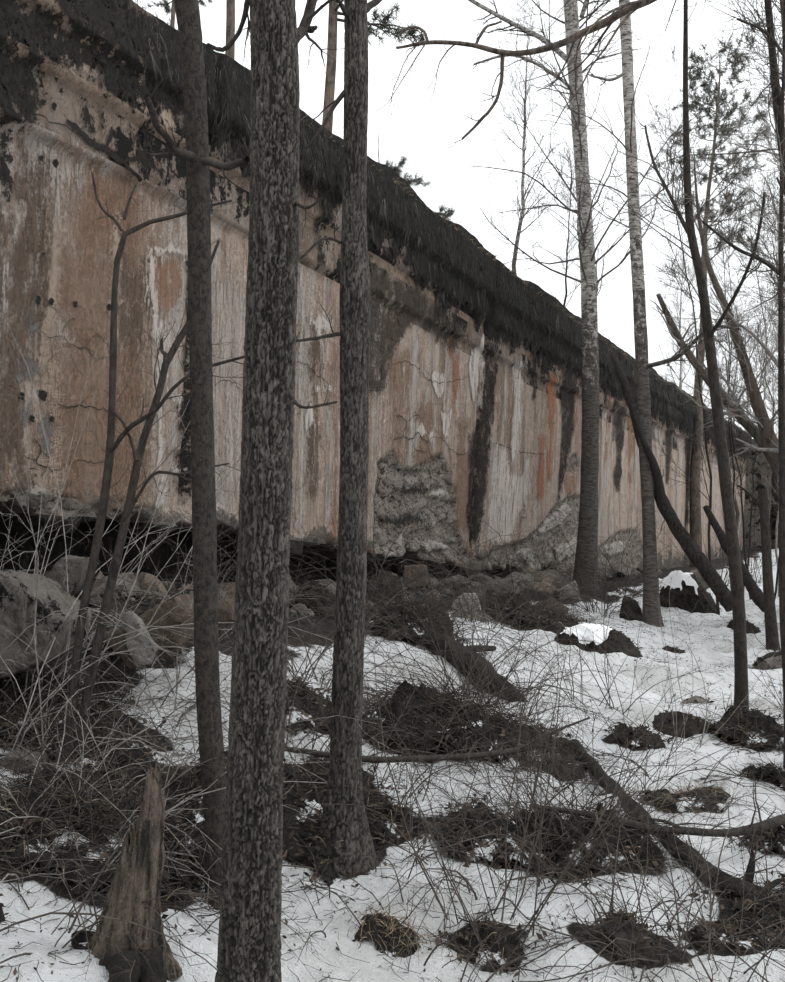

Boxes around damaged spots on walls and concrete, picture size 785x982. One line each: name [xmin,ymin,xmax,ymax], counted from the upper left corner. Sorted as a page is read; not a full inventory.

water stain [0,0,192,508]
rust [153,252,182,317]
water stain [368,254,467,468]
peeling [416,409,452,442]
peeling [431,371,445,398]
peeling [469,334,485,401]
water stain [447,338,548,548]
rust [536,375,557,501]
water stain [551,360,579,512]
spalling [367,451,580,576]